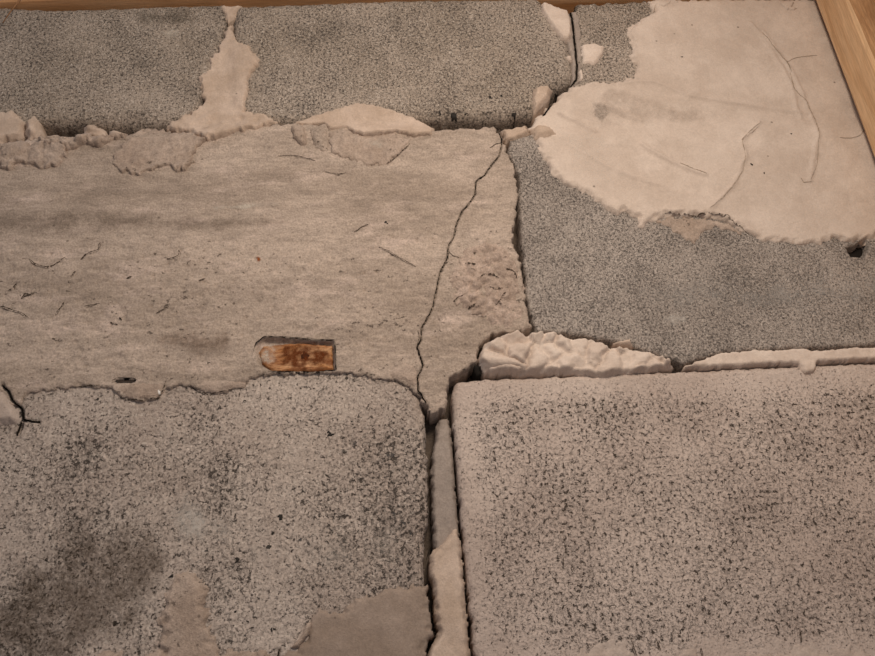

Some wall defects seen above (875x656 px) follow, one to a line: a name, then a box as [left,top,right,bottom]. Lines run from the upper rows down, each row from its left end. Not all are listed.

flaking render [656,216,741,245]
crack [416,133,502,403]
corrosion [283,345,328,367]
flaking render [386,362,419,388]
flaking render [117,383,164,399]
crack [2,384,40,436]